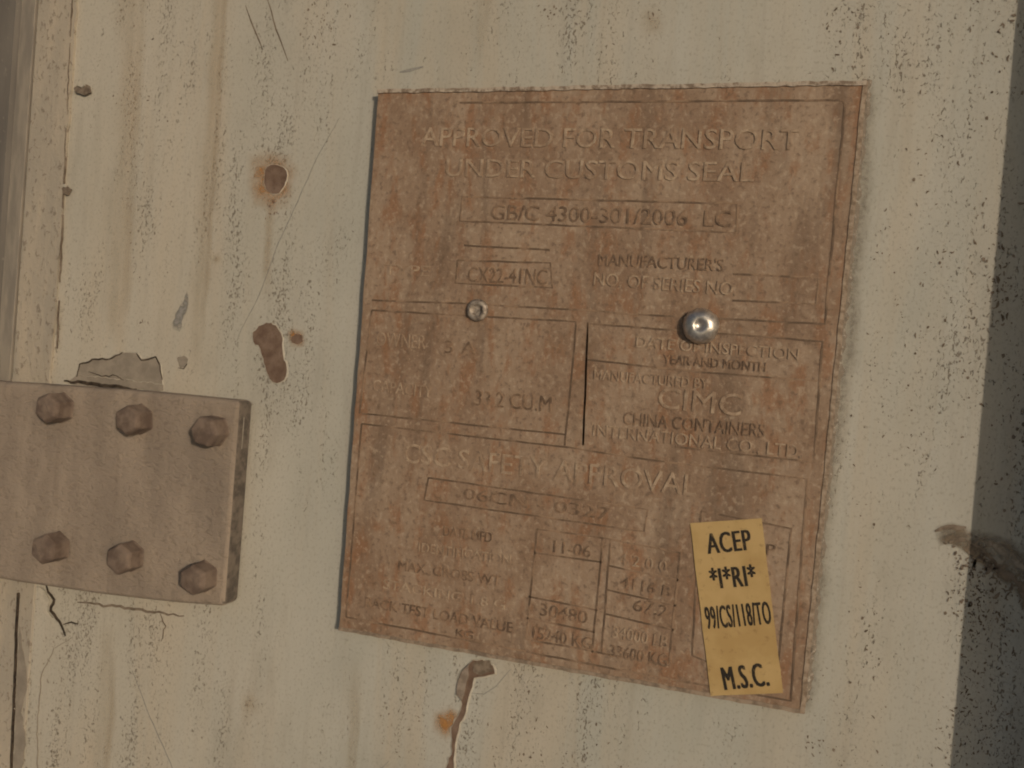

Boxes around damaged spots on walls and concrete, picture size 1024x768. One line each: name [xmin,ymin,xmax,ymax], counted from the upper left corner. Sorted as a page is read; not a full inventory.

corrosion [259,164,288,219]
spalling [64,338,164,391]
crack [38,586,184,641]
spalling [935,529,1024,768]
peeling [439,658,497,768]